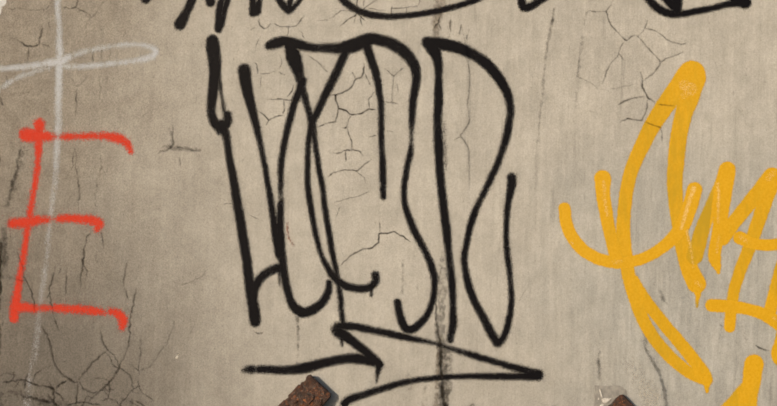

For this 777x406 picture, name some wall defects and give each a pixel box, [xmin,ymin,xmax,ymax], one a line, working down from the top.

crack [330,67,373,171]
crack [4,338,77,405]
rust [278,374,331,406]
crack [439,342,447,406]
rust [608,394,634,406]